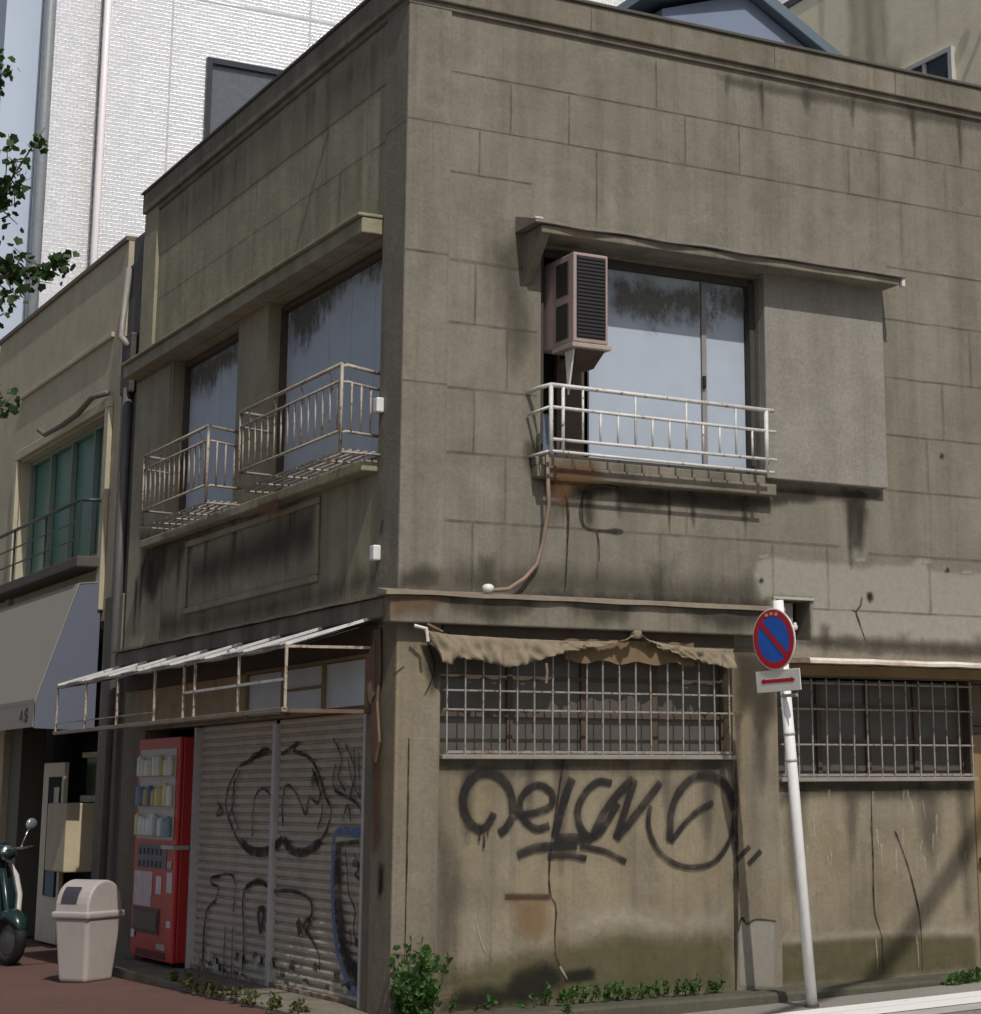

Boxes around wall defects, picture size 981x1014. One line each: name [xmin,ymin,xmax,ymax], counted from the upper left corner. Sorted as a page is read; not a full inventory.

leakage [570,484,865,546]
leakage [134,533,166,612]
crack [871,790,923,970]
leakage [451,964,594,1009]